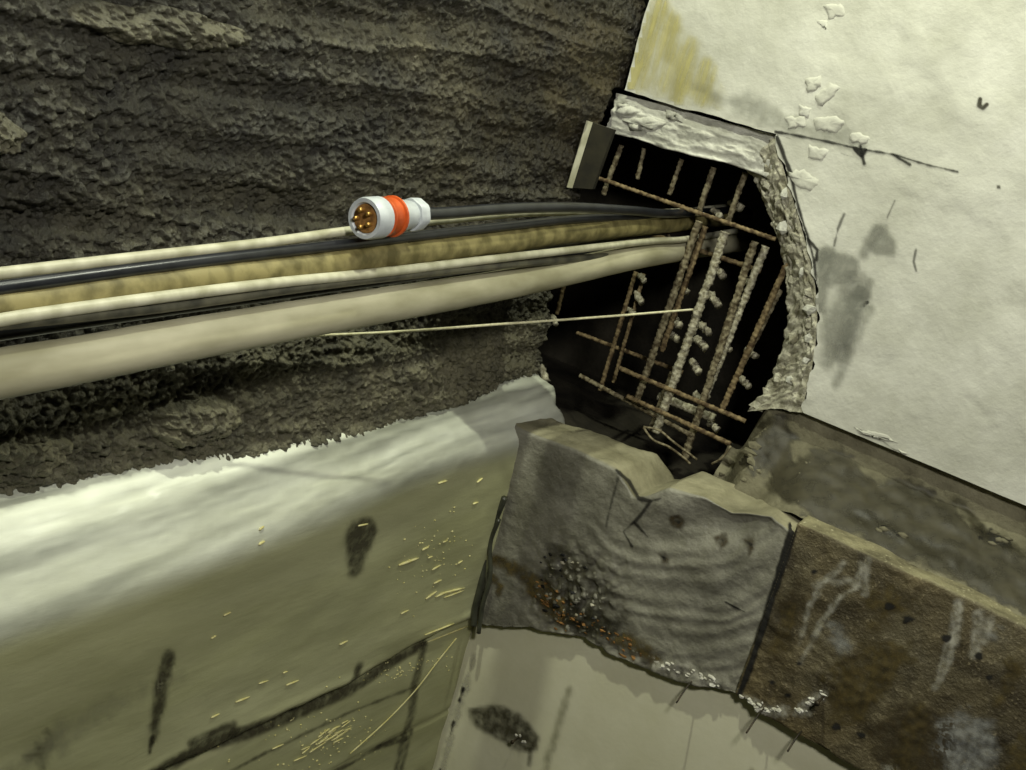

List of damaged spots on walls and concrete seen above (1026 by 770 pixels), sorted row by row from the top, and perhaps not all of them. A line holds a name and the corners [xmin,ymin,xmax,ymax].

crack [775,131,958,286]
spalling [551,286,566,327]
spalling [576,93,829,482]
damp [815,227,894,365]
damp [347,519,376,574]
corrosion [492,556,660,662]
damp [149,653,174,753]